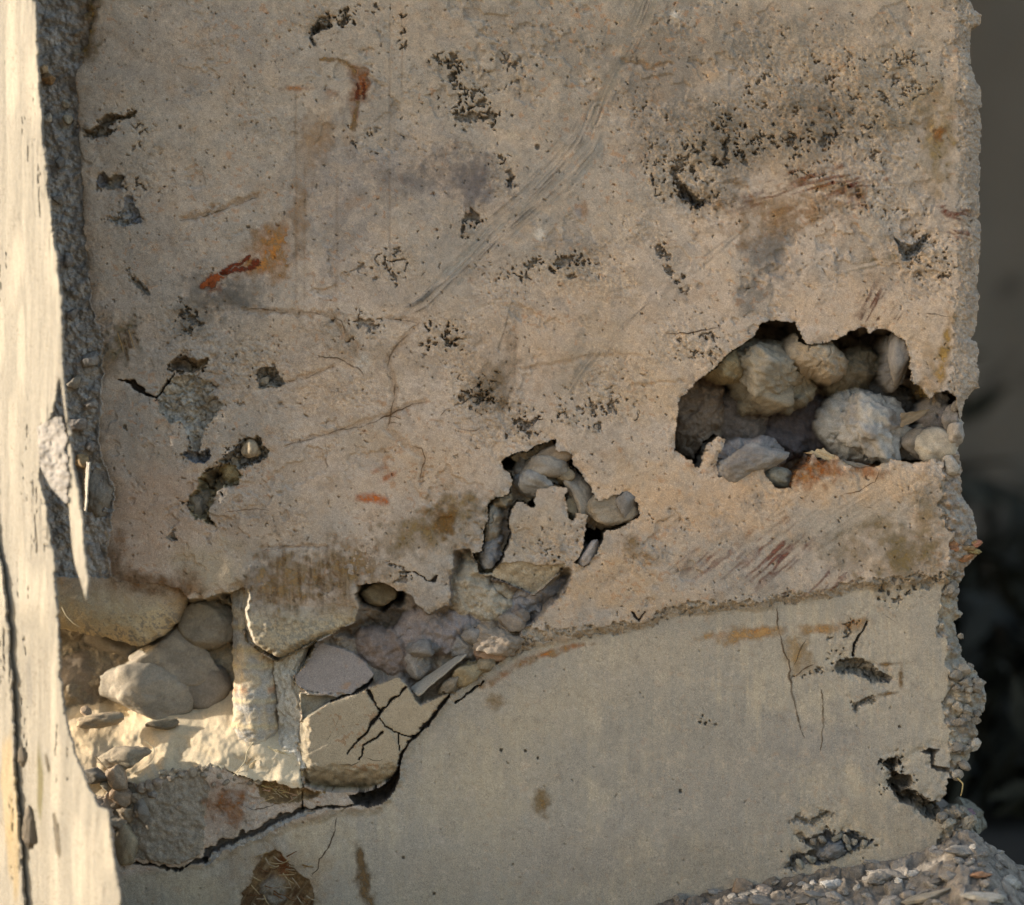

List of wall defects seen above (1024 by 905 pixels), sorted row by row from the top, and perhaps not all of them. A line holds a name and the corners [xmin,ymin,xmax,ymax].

rust [319,57,371,130]
rust [200,226,288,289]
crack [119,376,174,399]
spalling [156,373,270,471]
flaking render [737,341,805,414]
spalling [827,0,987,846]
flaking render [517,444,639,526]
crack [776,609,824,751]
crack [328,678,485,766]
spalling [85,746,211,866]
crack [133,802,357,874]
spalling [781,809,883,872]